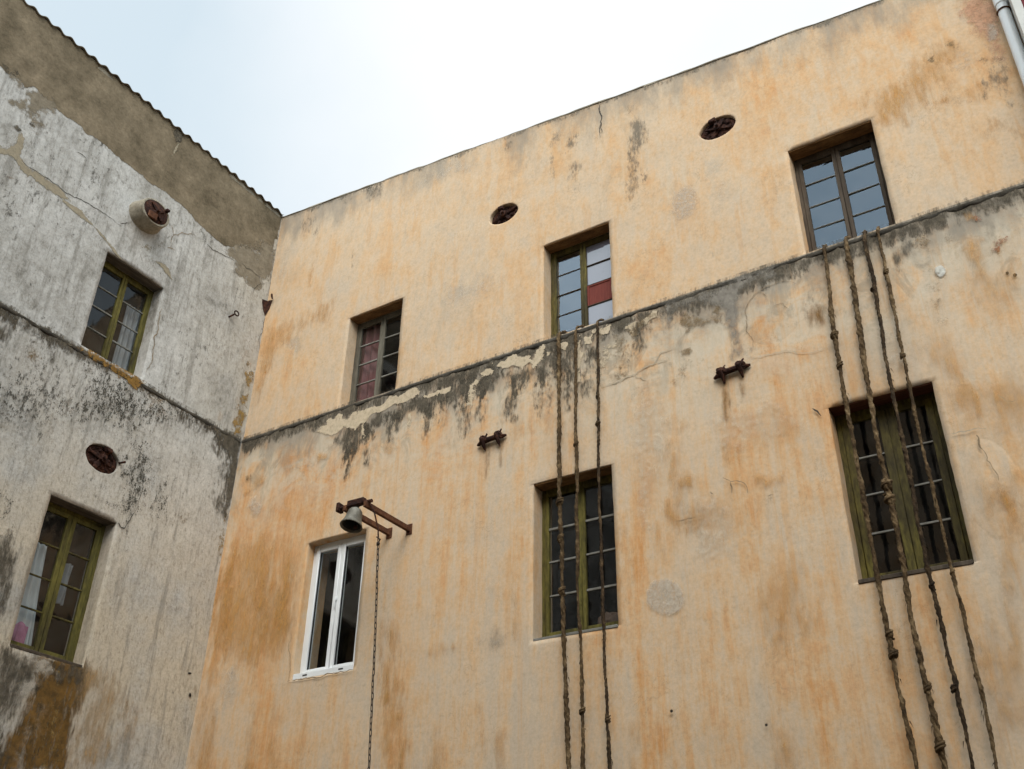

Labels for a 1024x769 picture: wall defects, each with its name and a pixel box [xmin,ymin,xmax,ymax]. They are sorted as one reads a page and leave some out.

leakage [628,121,642,171]
crack [23,162,128,226]
peeling [318,386,451,438]
leakage [0,186,1024,661]
crack [976,435,999,480]
leakage [0,646,38,718]